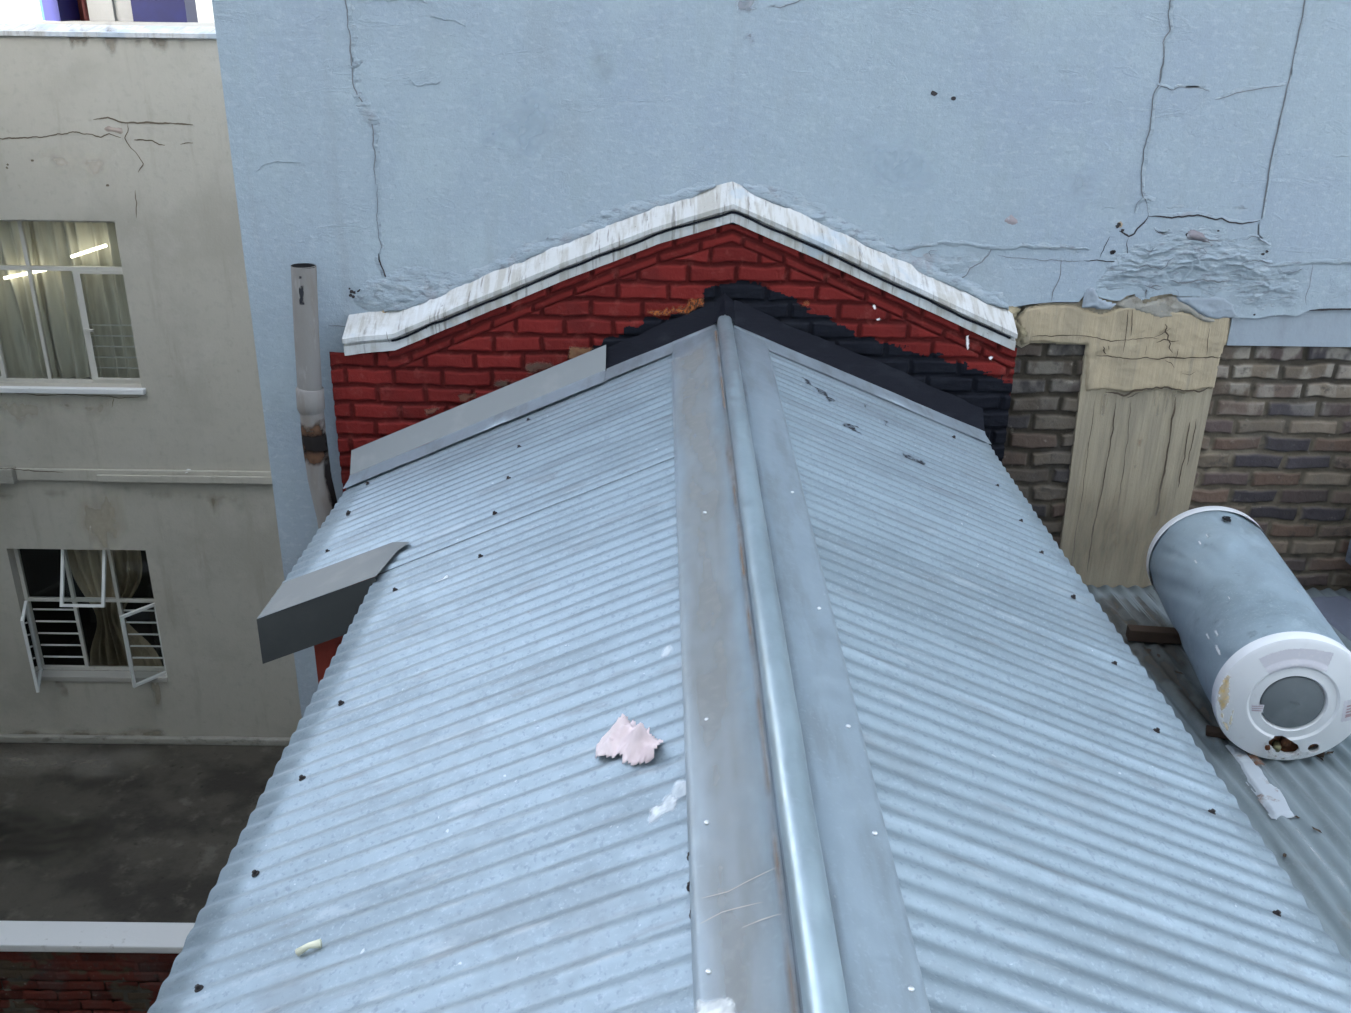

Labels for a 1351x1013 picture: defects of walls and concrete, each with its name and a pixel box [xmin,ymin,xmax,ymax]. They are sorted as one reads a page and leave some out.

crack [0,117,192,217]
crack [345,0,386,279]
crack [961,0,1351,570]
spalling [1082,288,1237,322]
spalling [1185,230,1220,246]
rust [301,423,337,509]
flaking render [1002,306,1085,547]
flaking render [1188,345,1351,591]